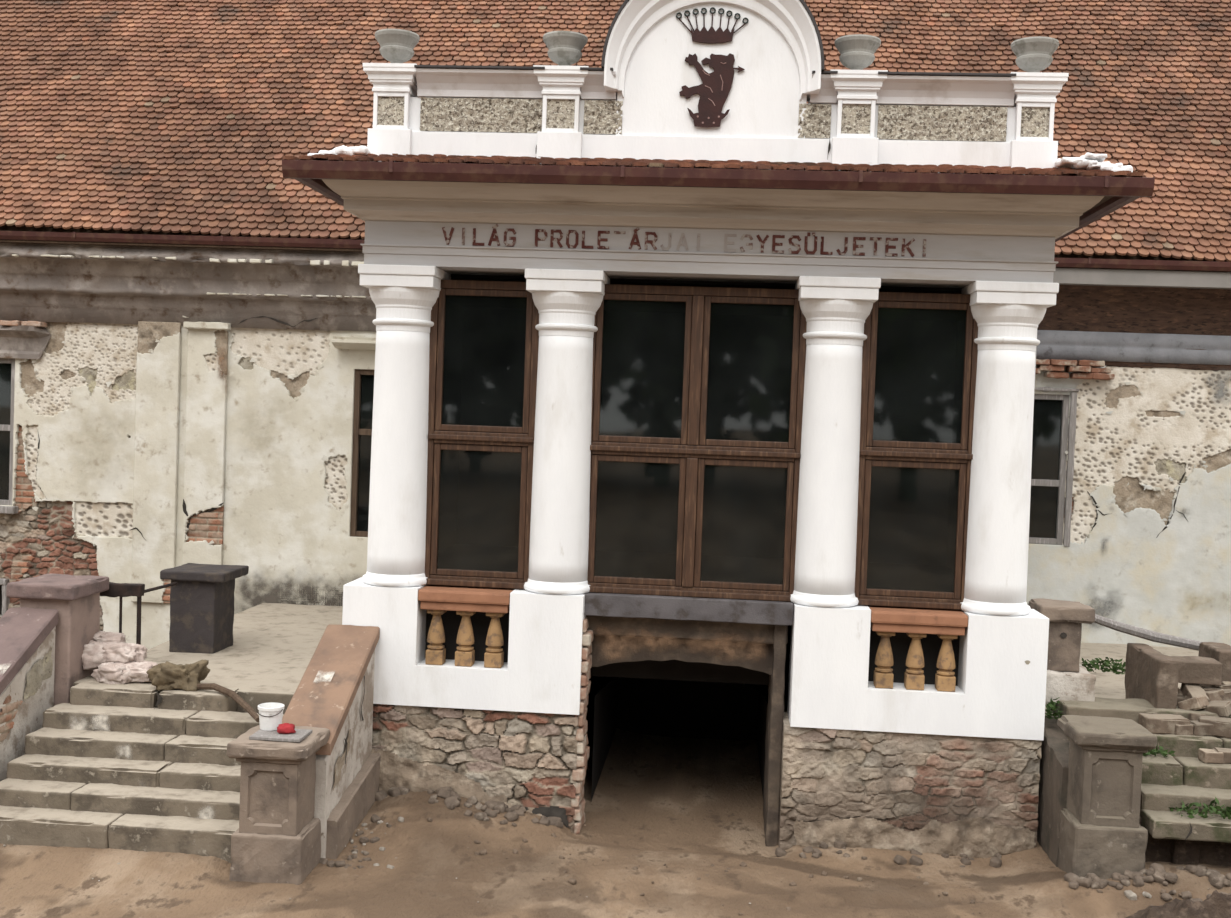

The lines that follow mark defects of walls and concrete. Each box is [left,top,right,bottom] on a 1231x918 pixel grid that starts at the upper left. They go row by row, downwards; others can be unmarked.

peeling [20,322,67,397]
peeling [137,315,189,354]
peeling [214,330,255,376]
peeling [60,366,136,396]
peeling [271,365,323,401]
peeling [1105,382,1144,414]
peeling [1145,410,1186,420]
flaking render [15,424,46,514]
peeling [1202,449,1231,473]
peeling [1112,458,1187,526]
flaking render [185,505,235,545]
peeling [0,647,53,744]